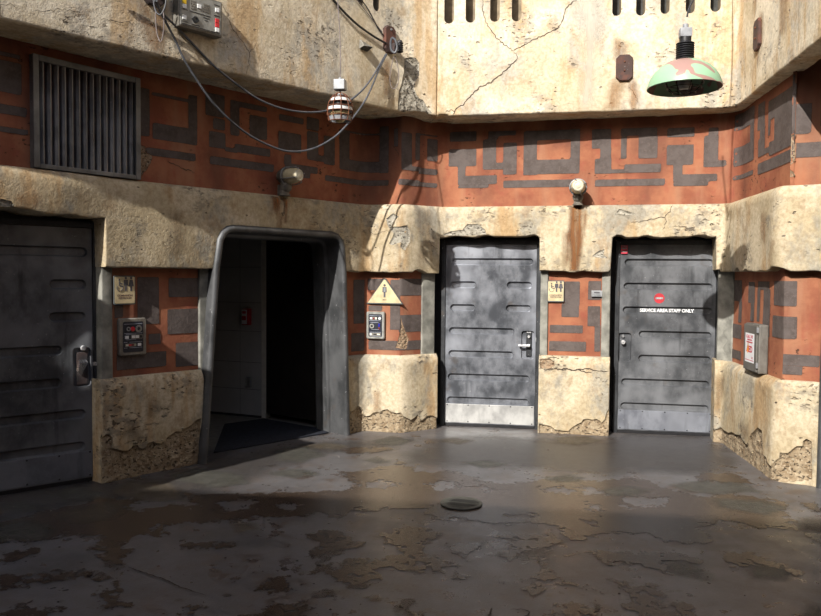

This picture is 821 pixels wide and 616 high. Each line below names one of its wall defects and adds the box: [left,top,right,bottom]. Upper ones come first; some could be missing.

spalling [398,57,431,114]
crack [447,0,576,114]
spalling [386,214,410,250]
corrosion [567,206,586,270]
spalling [100,419,201,483]
spalling [350,406,437,434]
spalling [539,410,609,436]
spalling [713,428,812,482]